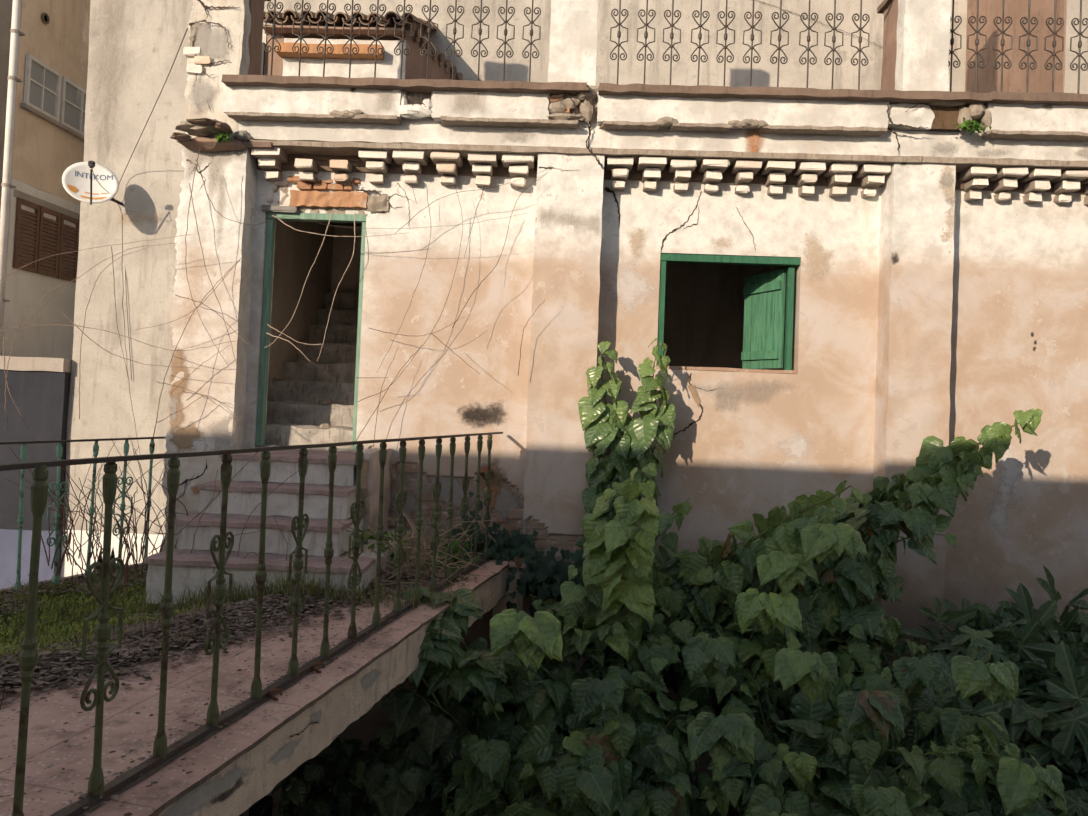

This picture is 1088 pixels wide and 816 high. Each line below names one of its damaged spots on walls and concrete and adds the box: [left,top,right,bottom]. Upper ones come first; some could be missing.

flaking render [183,23,225,106]
crack [539,93,621,226]
crack [887,103,928,151]
crack [661,191,702,251]
peeling [169,349,200,450]
crack [664,373,723,453]
flaking render [388,463,584,570]